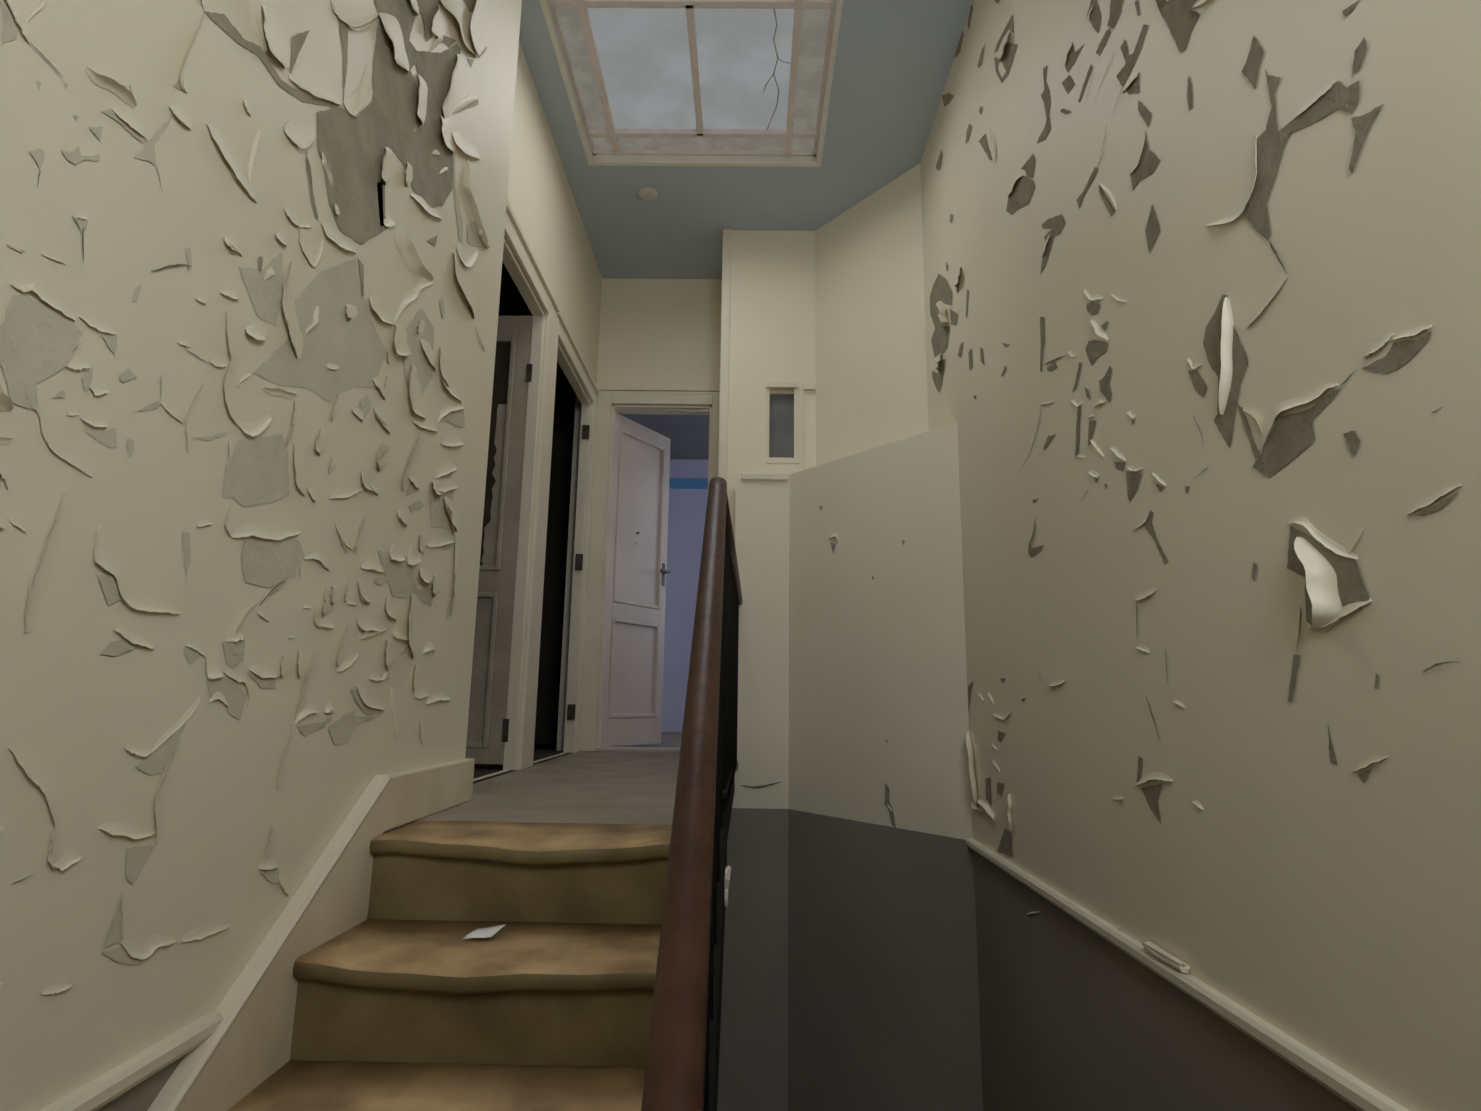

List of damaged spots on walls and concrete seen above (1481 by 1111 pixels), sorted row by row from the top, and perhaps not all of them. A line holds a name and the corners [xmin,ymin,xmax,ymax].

peeling [977,16,1018,83]
peeling [1006,0,1212,216]
peeling [0,282,138,477]
peeling [30,0,491,964]
peeling [930,263,985,392]
peeling [1040,215,1065,273]
peeling [1020,289,1167,501]
peeling [1145,205,1160,253]
peeling [1187,36,1432,478]
peeling [1287,517,1372,702]
peeling [966,678,1026,856]
peeling [1112,756,1173,823]